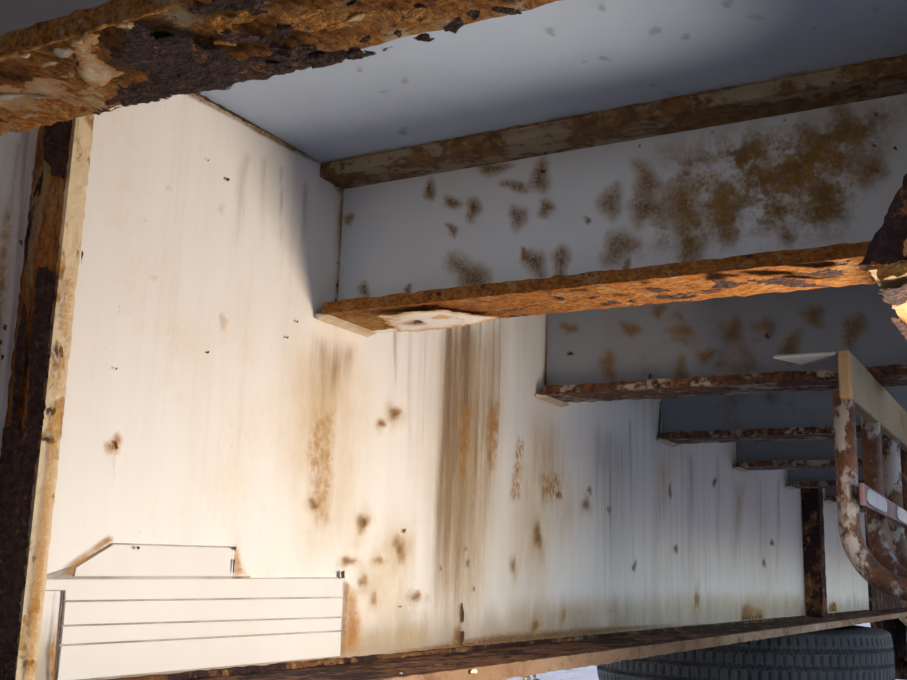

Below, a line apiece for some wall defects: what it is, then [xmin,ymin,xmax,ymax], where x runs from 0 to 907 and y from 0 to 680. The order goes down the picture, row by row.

rust [208,10,258,46]
rust [275,5,444,32]
peeling [0,33,133,118]
rust [502,161,546,192]
rust [632,105,884,262]
rust [522,247,542,278]
rust [874,263,907,282]
rust [311,416,331,516]
rust [442,325,477,549]
rust [488,404,498,466]
rust [28,430,57,680]